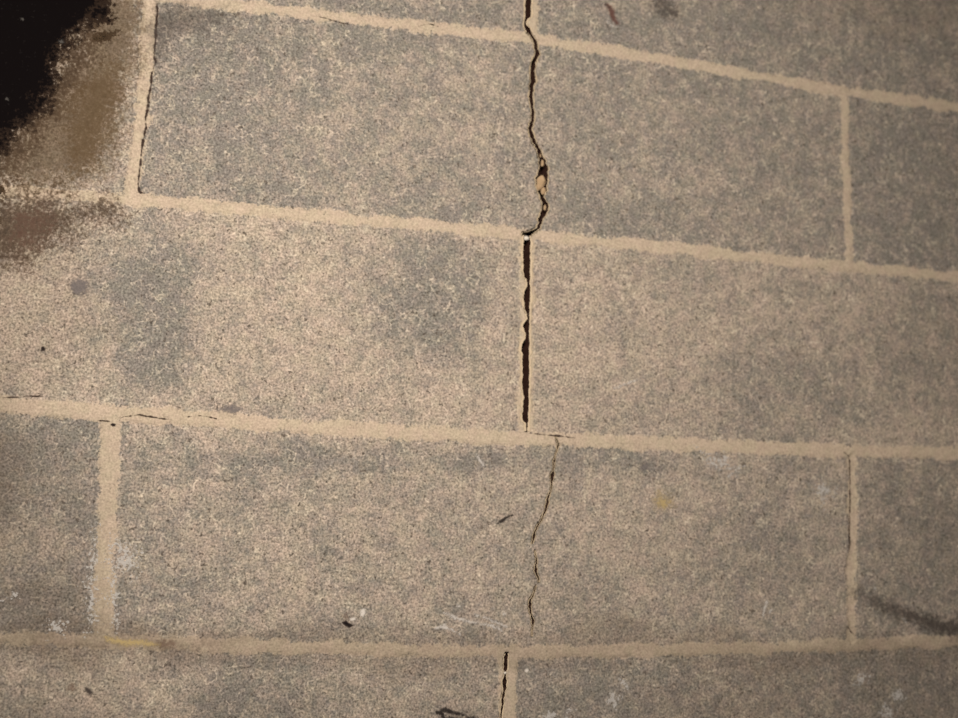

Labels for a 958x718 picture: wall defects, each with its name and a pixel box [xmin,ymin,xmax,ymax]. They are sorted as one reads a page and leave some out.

crack [518,0,575,636]
crack [499,653,509,718]